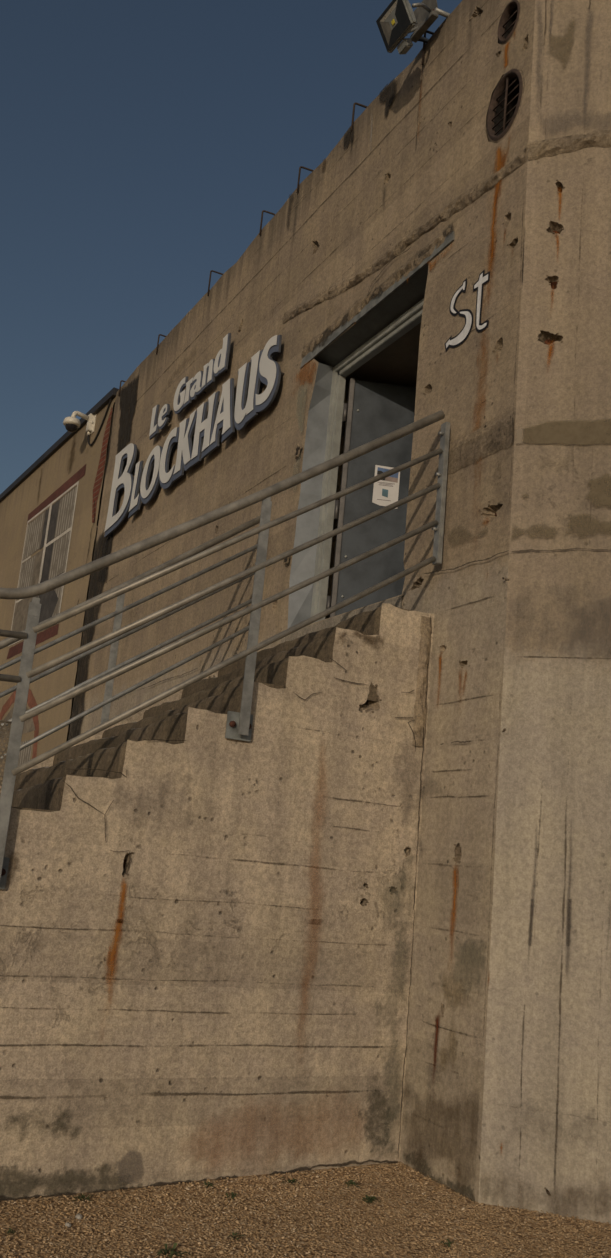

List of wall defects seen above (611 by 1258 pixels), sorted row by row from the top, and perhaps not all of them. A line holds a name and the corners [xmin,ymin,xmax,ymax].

corrosion [490,148,505,268]
spalling [479,503,503,523]
spalling [359,682,381,713]
corrosion [108,882,126,978]